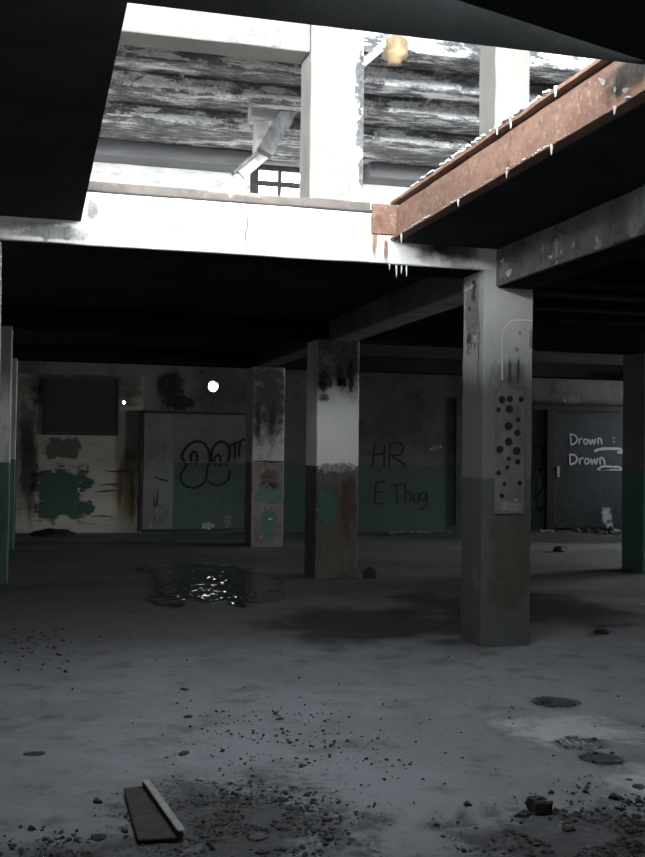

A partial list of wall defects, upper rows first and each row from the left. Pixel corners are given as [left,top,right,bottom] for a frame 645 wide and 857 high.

rust [597,63,645,97]
rust [364,220,388,259]
damp [319,362,354,392]